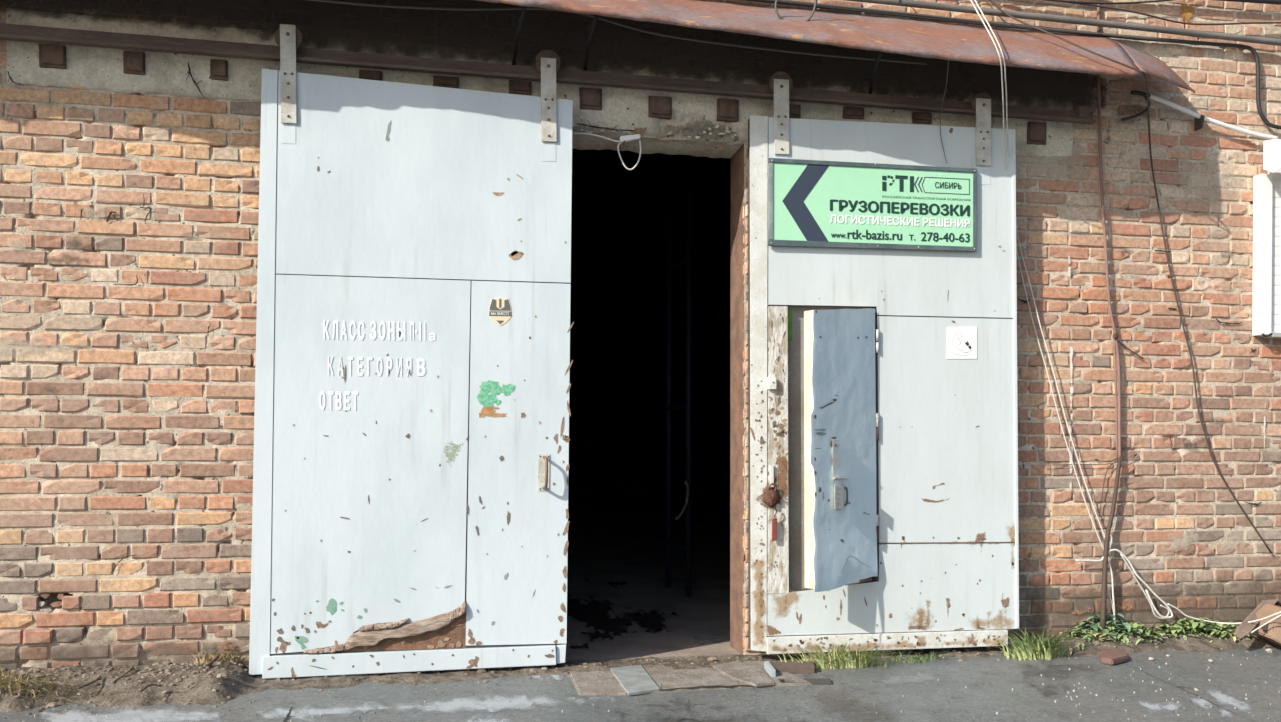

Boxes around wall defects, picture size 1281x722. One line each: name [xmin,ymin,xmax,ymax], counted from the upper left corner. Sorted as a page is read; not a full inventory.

corrosion [756,453,788,508]
peeling [267,598,482,678]
water stain [567,577,676,649]
corrosion [752,561,1010,651]